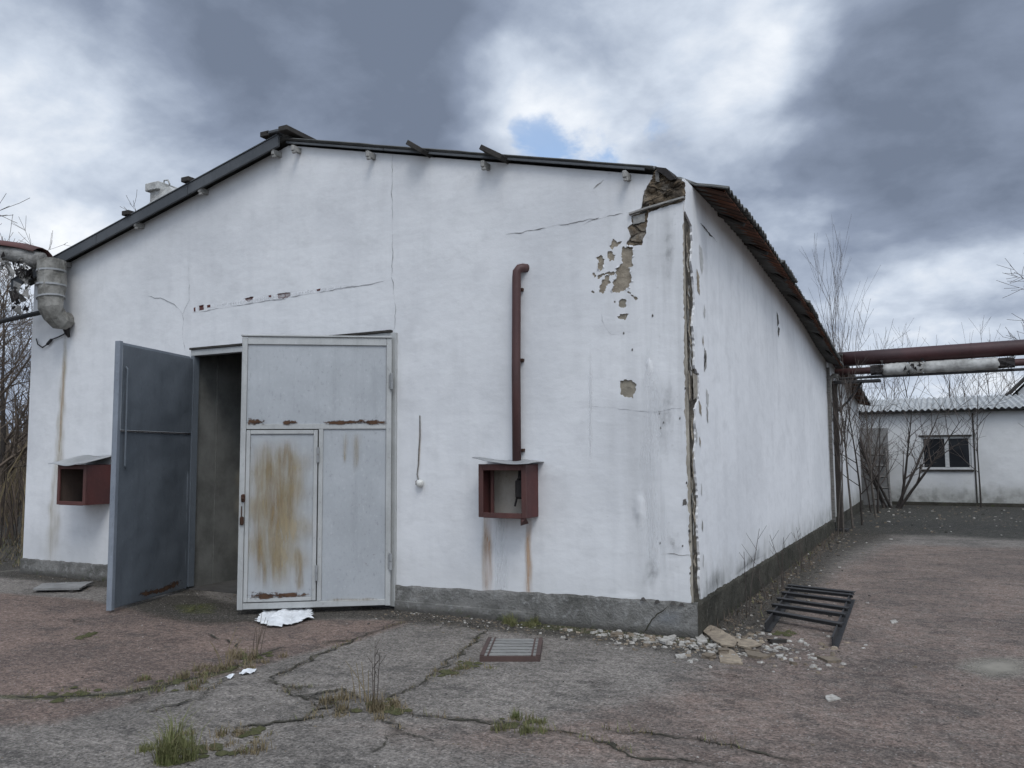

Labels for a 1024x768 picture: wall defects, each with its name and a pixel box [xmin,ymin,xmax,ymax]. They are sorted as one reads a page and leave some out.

crack [510,173,623,234]
flaking render [231,281,382,306]
spalling [592,170,709,607]